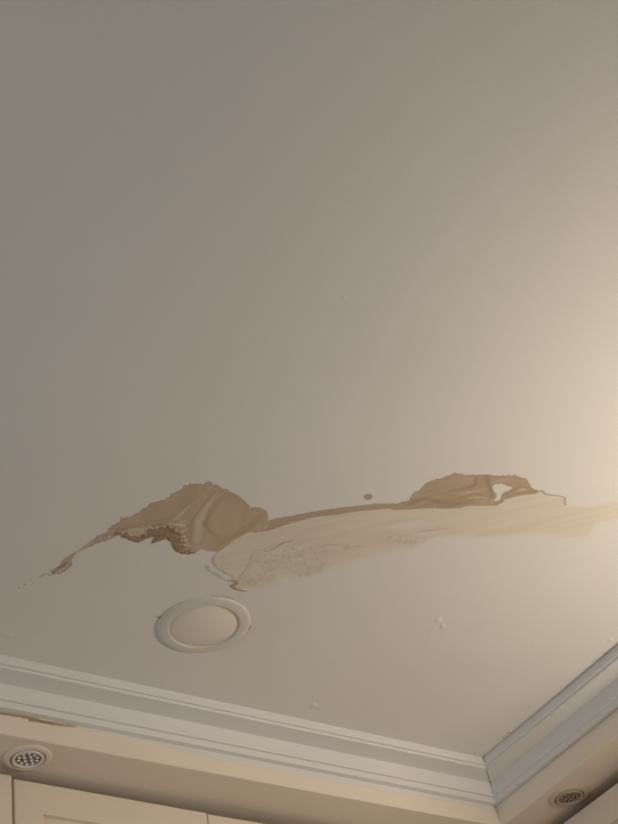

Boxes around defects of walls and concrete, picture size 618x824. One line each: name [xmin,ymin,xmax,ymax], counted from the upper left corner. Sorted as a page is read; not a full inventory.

flaking render [51,519,196,575]